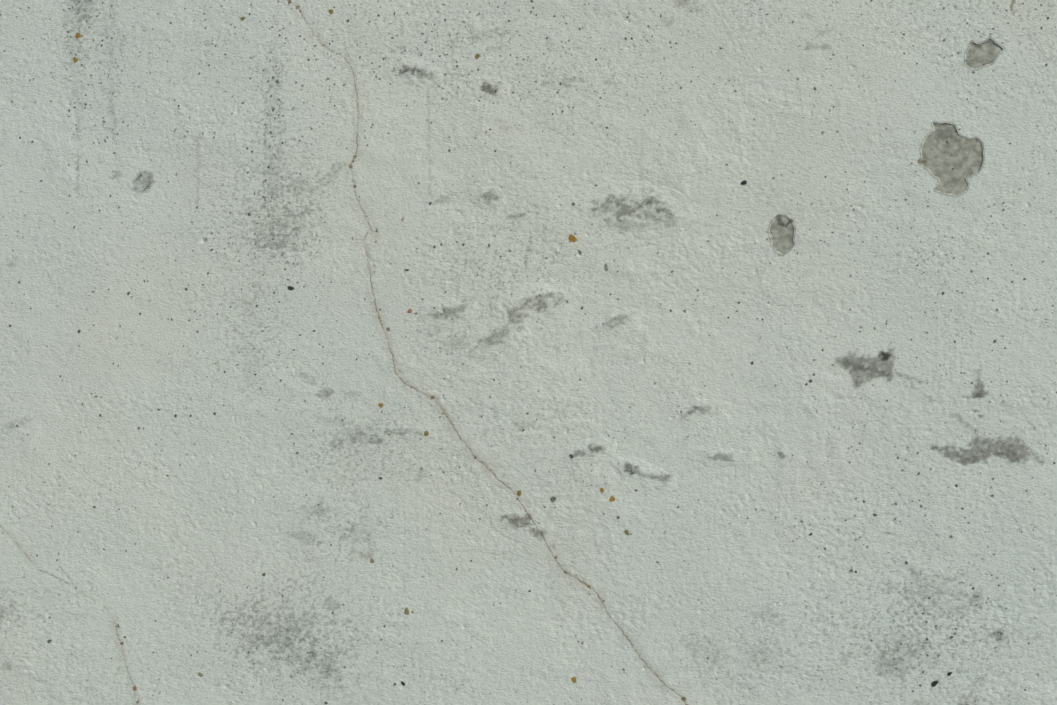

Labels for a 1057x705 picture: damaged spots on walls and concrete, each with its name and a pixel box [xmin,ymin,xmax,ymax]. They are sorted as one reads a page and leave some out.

peeling [963,36,1005,71]
peeling [917,121,985,197]
peeling [767,213,797,255]
spalling [837,349,894,385]
spalling [934,437,1038,463]